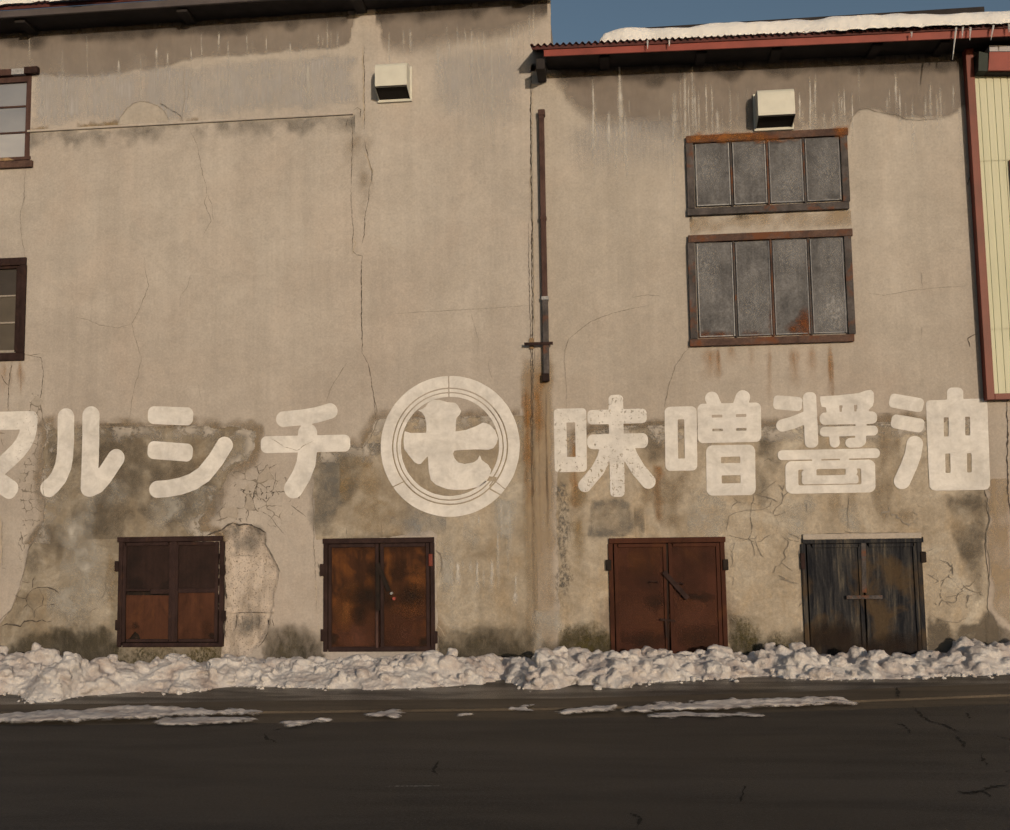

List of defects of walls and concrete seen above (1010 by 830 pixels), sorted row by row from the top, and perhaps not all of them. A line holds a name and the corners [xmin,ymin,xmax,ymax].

leakage [0,10,356,78]
leakage [380,4,547,56]
leakage [545,62,965,141]
crack [326,50,378,448]
crack [0,257,149,627]
peeling [0,424,280,664]
crack [208,439,317,606]
corrosion [523,364,553,563]
crack [726,402,1010,623]
leakage [950,479,1008,563]
leakage [928,612,1010,653]